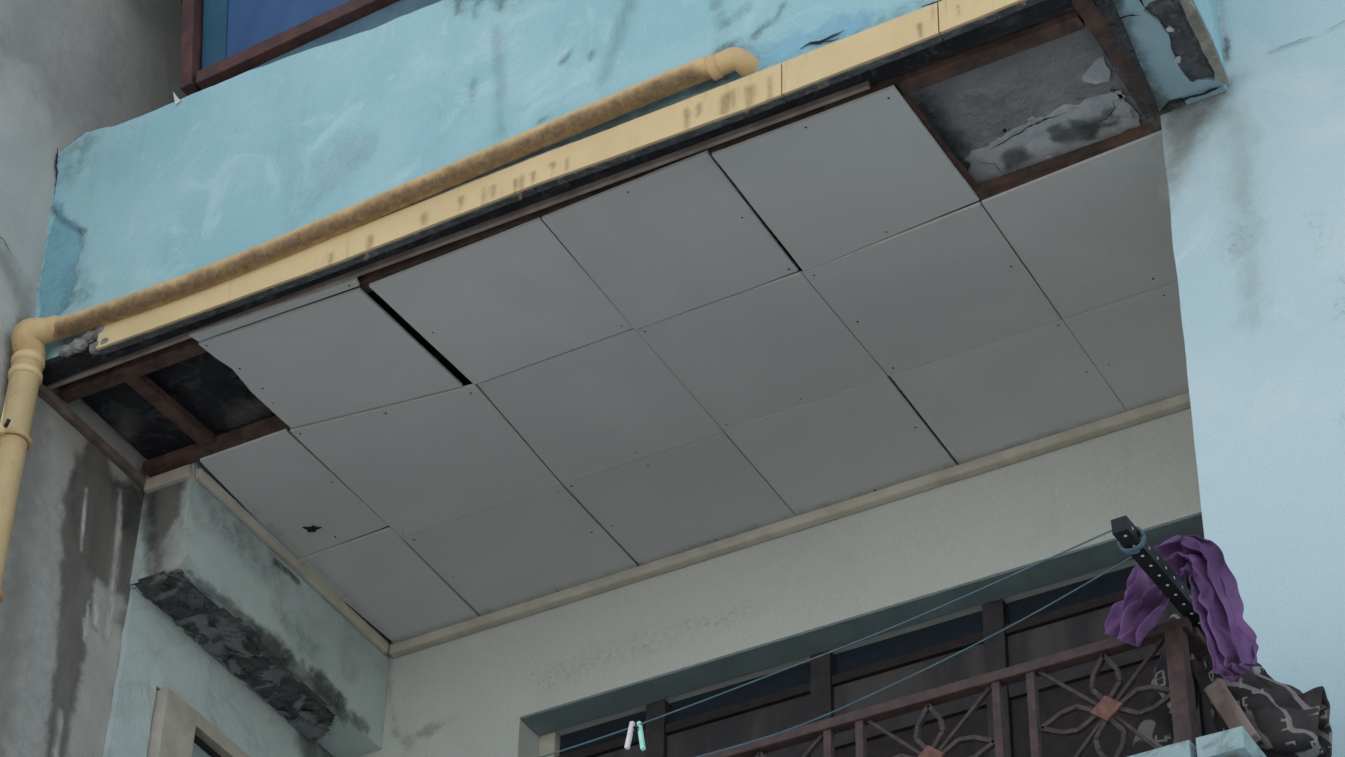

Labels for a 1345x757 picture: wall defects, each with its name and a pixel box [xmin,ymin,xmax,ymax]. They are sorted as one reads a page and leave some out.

leakage [42,0,1072,385]
peeling [965,56,1144,184]
leakage [1048,114,1115,141]
spalling [1145,0,1229,85]
leakage [48,443,144,757]
spalling [130,481,367,744]